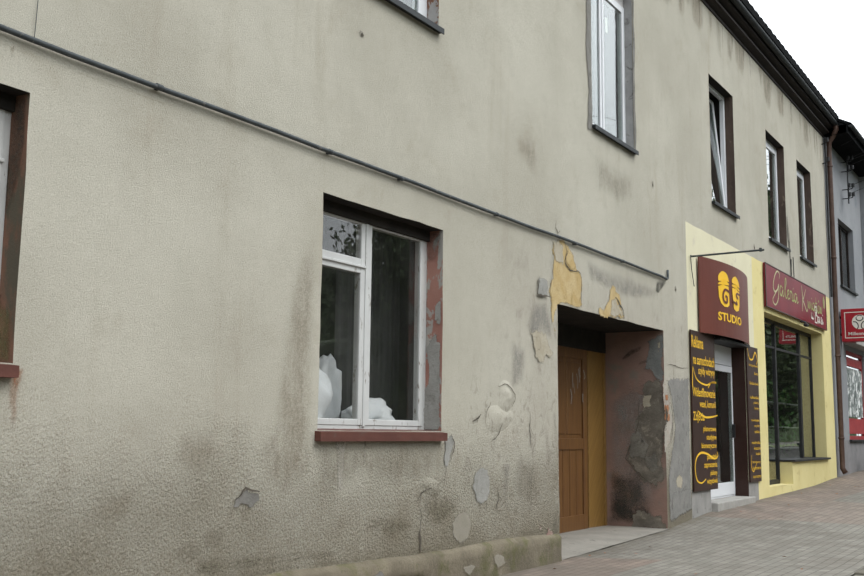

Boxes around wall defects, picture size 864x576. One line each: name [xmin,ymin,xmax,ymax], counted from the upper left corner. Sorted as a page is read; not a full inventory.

spalling [537,240,582,331]
spalling [599,286,625,319]
peeling [424,301,441,430]
spalling [625,335,673,488]
spalling [234,487,260,507]